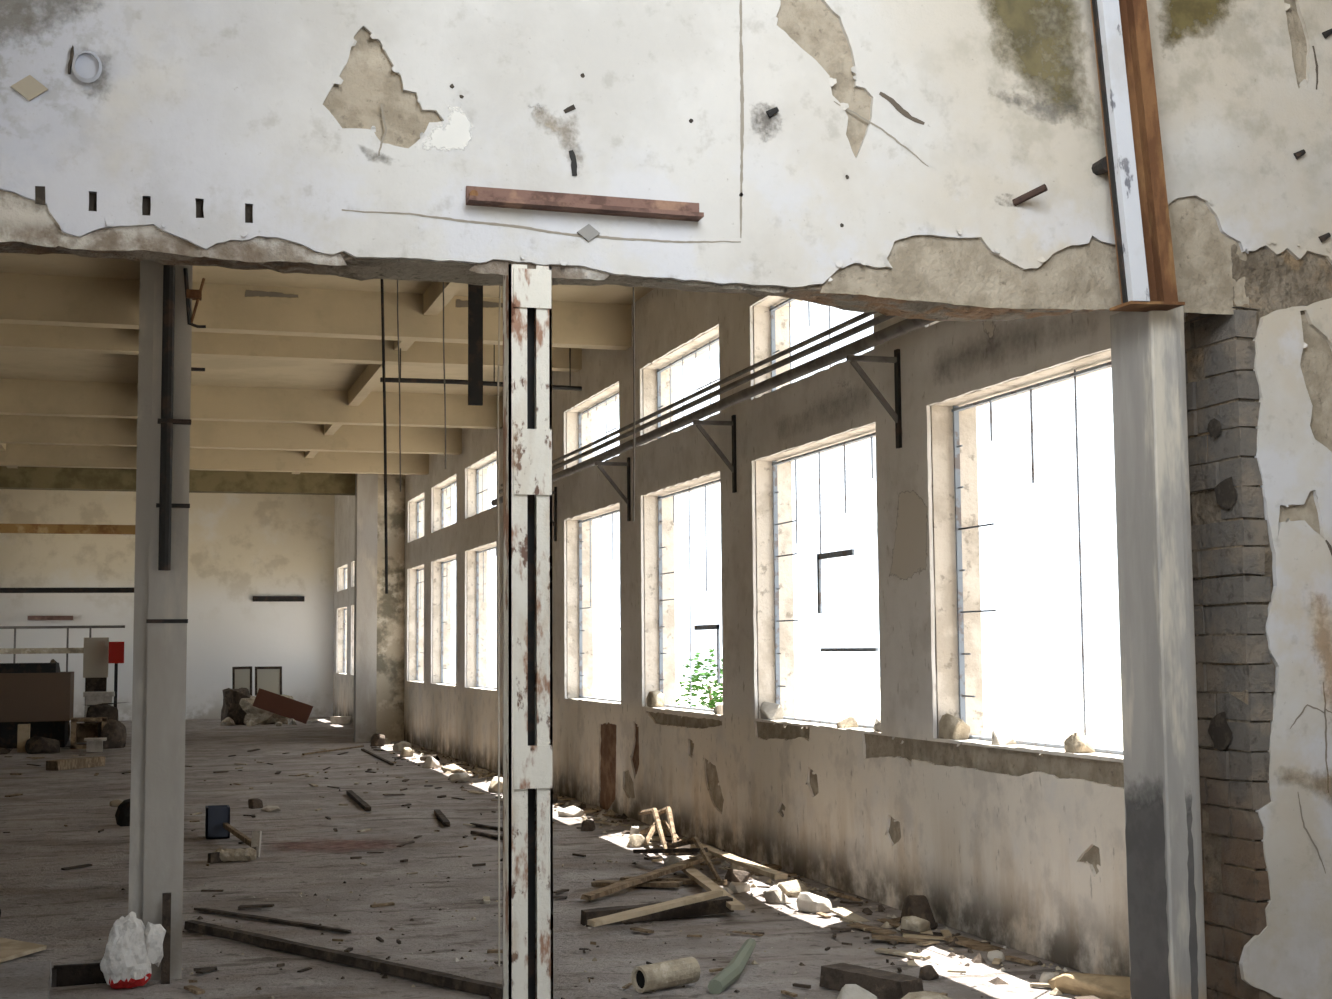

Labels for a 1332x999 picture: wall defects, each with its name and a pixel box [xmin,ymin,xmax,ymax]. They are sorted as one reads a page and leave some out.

water stain [0,0,77,33]
spalling [323,28,471,159]
spalling [769,0,871,157]
water stain [988,0,1081,119]
water stain [1164,0,1229,43]
spalling [1283,0,1307,89]
spalling [0,190,347,266]
spalling [470,255,611,280]
spalling [820,228,1122,310]
flaking render [1168,197,1332,999]
spalling [600,711,724,812]
crack [1290,682,1332,874]